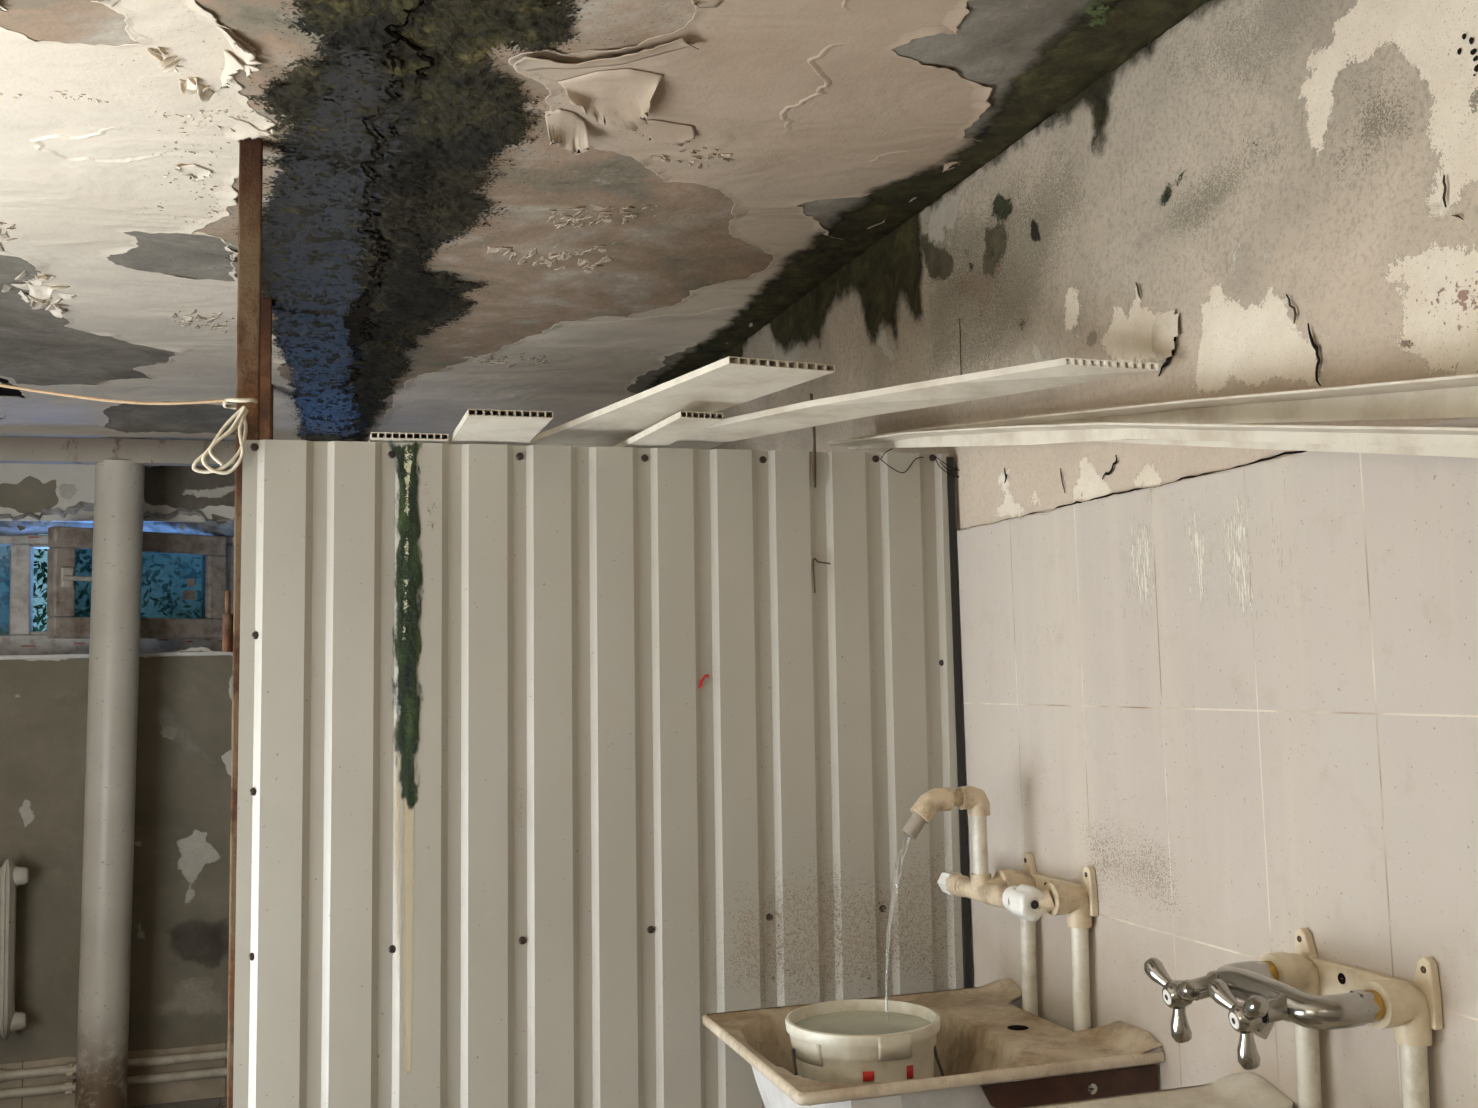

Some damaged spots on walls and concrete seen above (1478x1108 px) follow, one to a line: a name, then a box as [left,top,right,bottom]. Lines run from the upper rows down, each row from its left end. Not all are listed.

peeling [0,223,194,387]
peeling [0,0,336,290]
water stain [244,0,589,442]
peeling [356,0,782,442]
water stain [645,0,1342,391]
crack [1286,294,1321,386]
water stain [1320,48,1418,184]
peeling [1296,0,1478,376]
water stain [1416,271,1478,331]
water stain [1448,33,1478,89]
crack [956,451,1306,532]
peeling [0,658,89,1064]